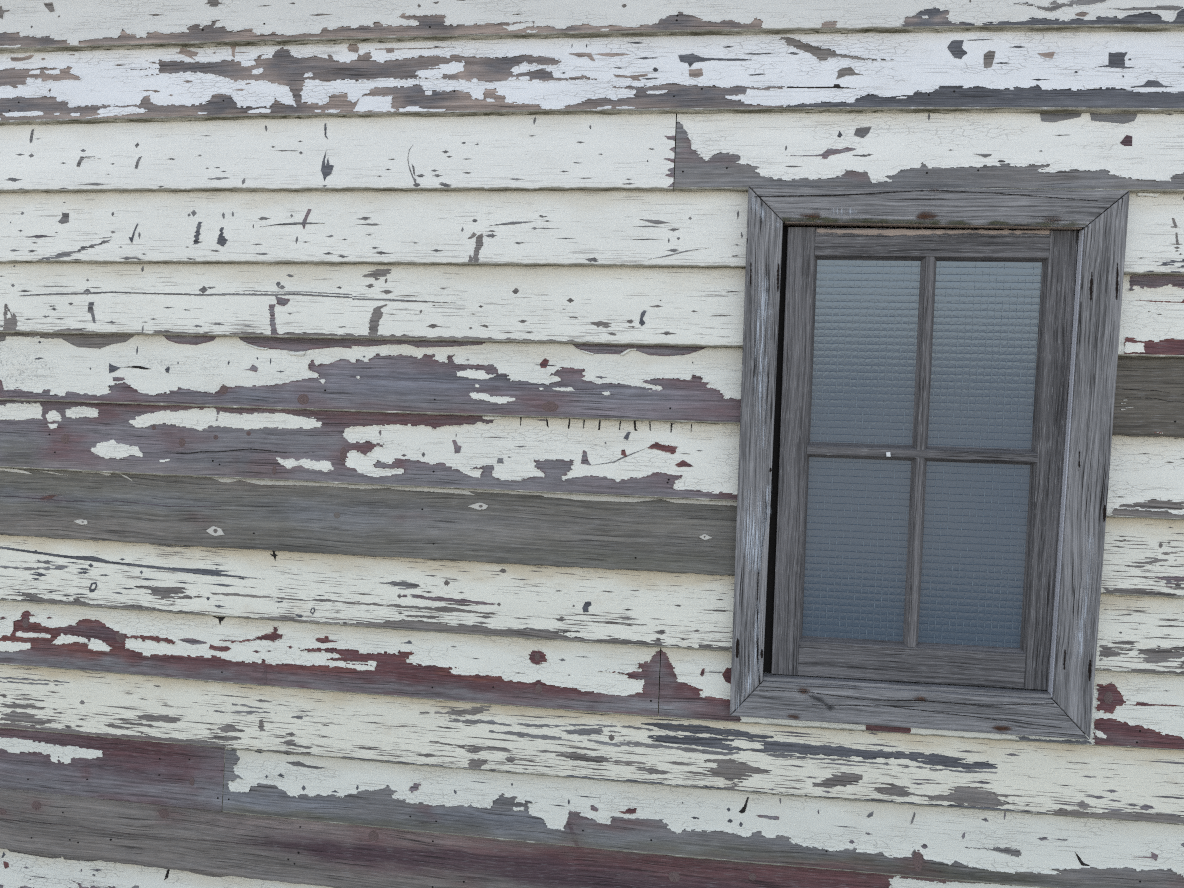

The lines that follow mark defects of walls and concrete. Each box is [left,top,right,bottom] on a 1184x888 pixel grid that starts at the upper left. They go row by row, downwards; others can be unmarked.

peeling [0,0,1184,200]
peeling [0,208,741,500]
peeling [1120,335,1184,355]
peeling [1109,496,1184,528]
peeling [0,542,1184,888]